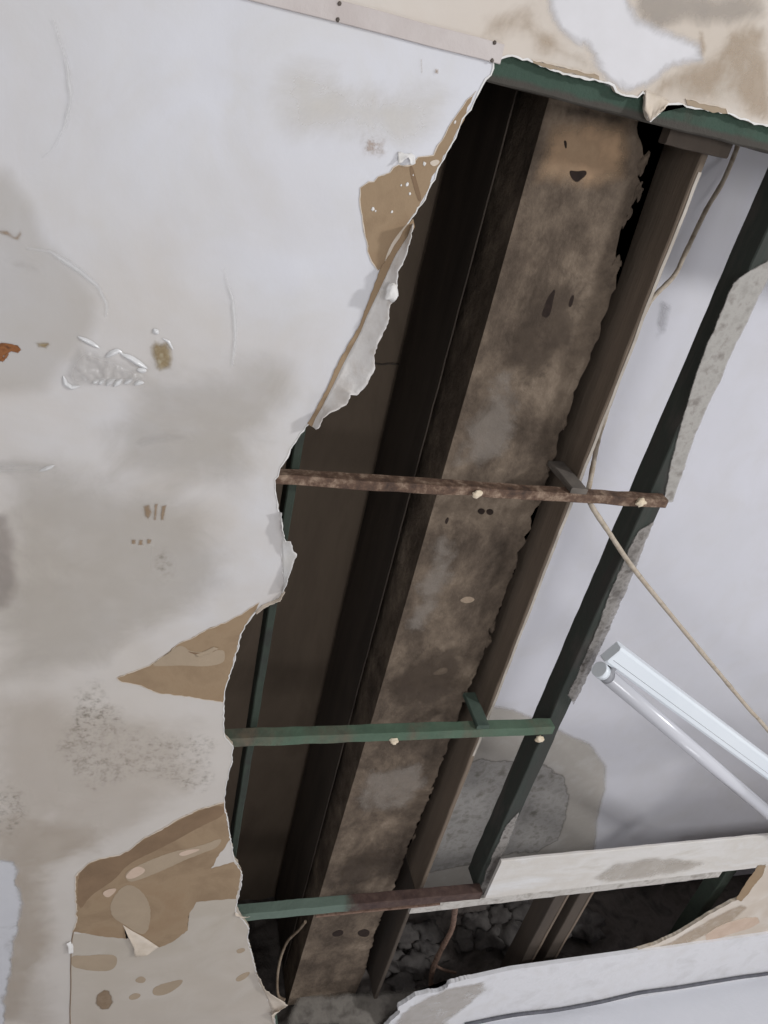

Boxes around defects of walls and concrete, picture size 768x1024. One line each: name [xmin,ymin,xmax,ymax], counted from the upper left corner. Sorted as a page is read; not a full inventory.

damp [642,0,749,23]
flaking render [644,90,669,121]
spalling [570,170,587,182]
spalling [622,151,651,228]
spalling [542,290,555,318]
peeling [307,219,415,429]
corrosion [0,343,21,362]
peeling [67,899,274,1024]